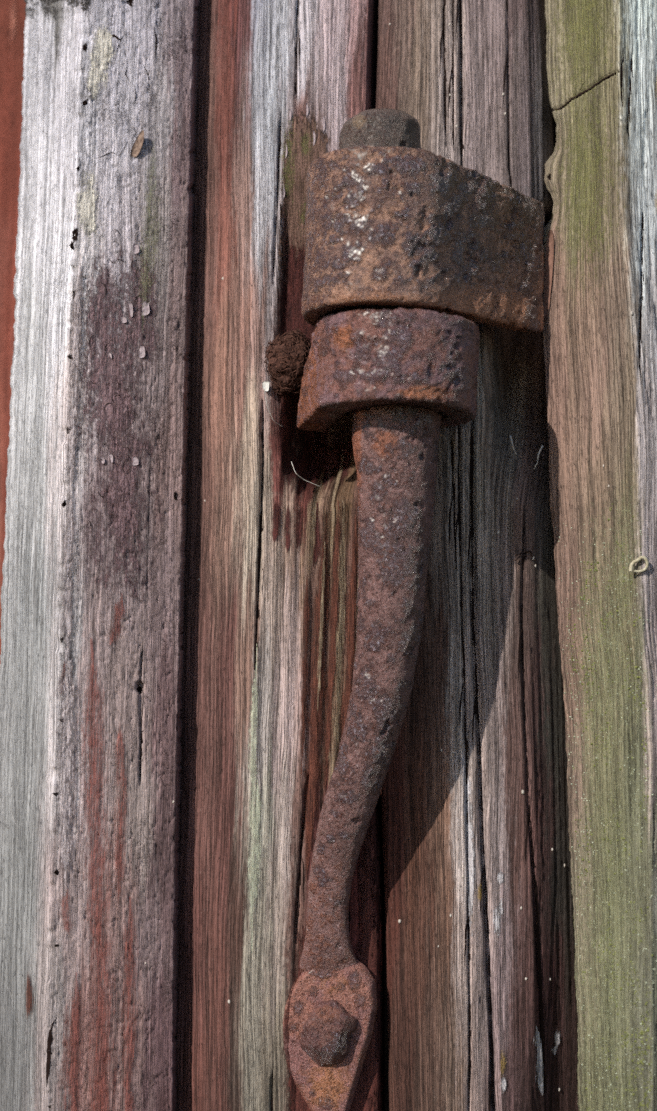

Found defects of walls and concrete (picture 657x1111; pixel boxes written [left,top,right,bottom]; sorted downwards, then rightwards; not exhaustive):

crack [552,56,633,136]
corrosion [275,236,315,342]
corrosion [272,426,358,879]